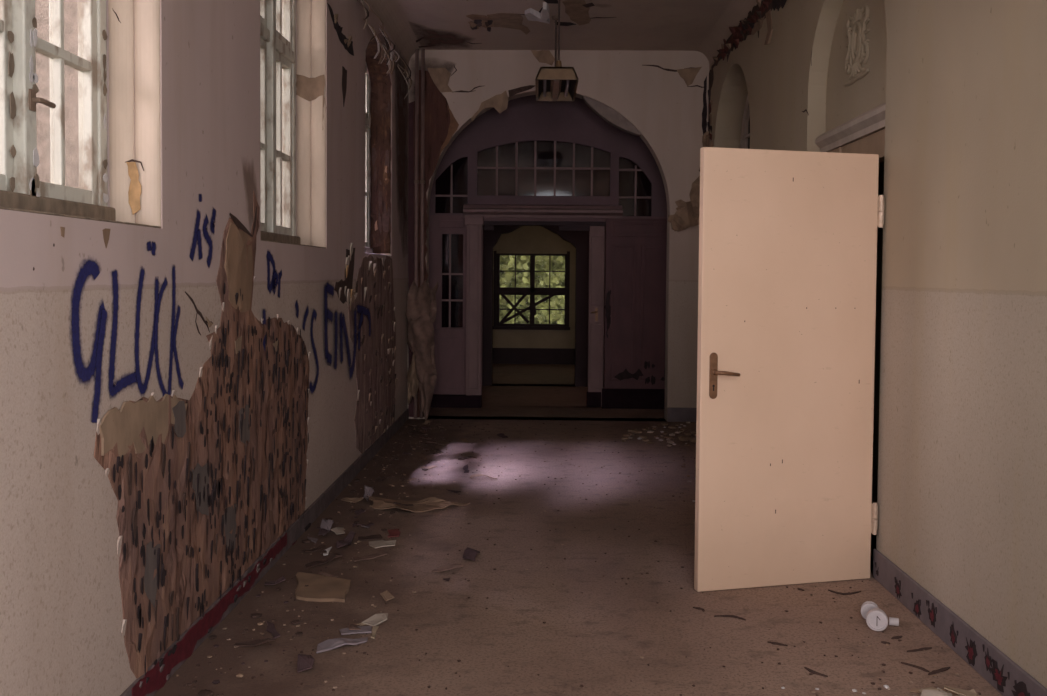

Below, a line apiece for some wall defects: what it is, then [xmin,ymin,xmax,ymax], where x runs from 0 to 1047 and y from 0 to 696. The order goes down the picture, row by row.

spalling [466,14,493,32]
peeling [539,0,595,26]
crack [643,65,704,88]
flaking render [677,0,772,147]
flaking render [471,85,535,122]
peeling [126,162,141,215]
peeling [668,168,700,232]
peeling [94,191,311,696]